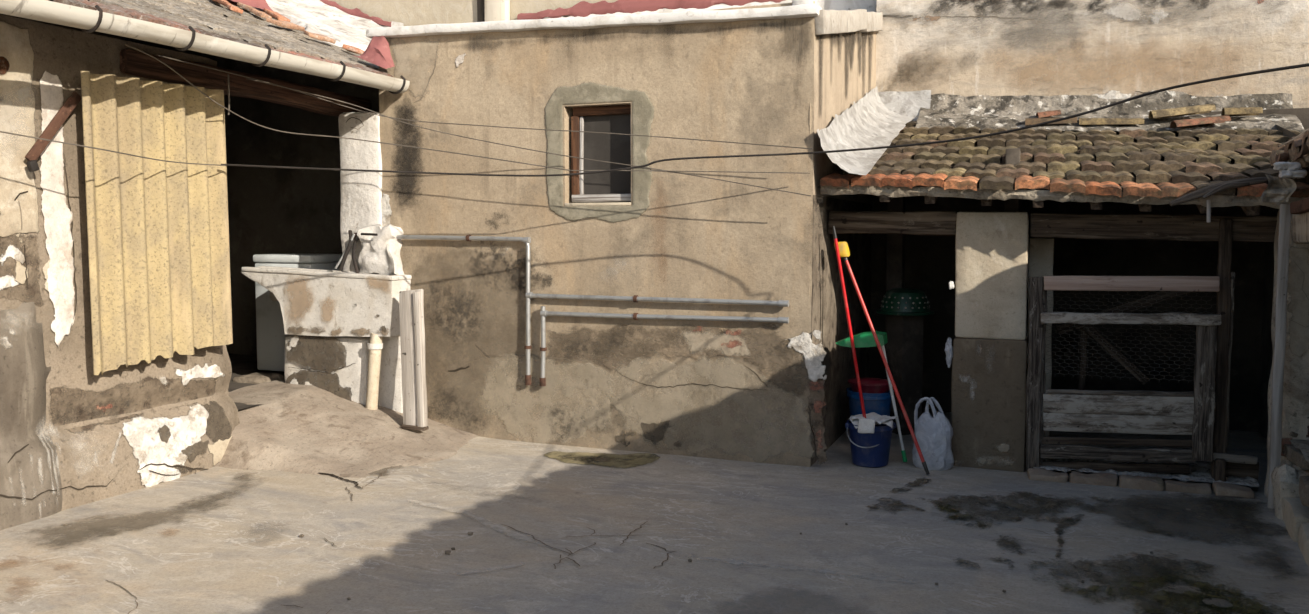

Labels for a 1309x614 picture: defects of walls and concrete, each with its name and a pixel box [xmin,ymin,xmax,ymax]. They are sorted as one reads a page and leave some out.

water stain [934,0,1073,44]
peeling [1111,4,1165,20]
water stain [1141,0,1210,23]
mould [394,105,420,205]
peeling [0,71,77,347]
water stain [410,246,552,421]
flaking render [50,363,232,488]
crack [481,355,768,396]
flaking render [545,324,828,464]
crack [320,468,388,501]
crack [410,500,675,569]
water stain [1081,493,1297,575]